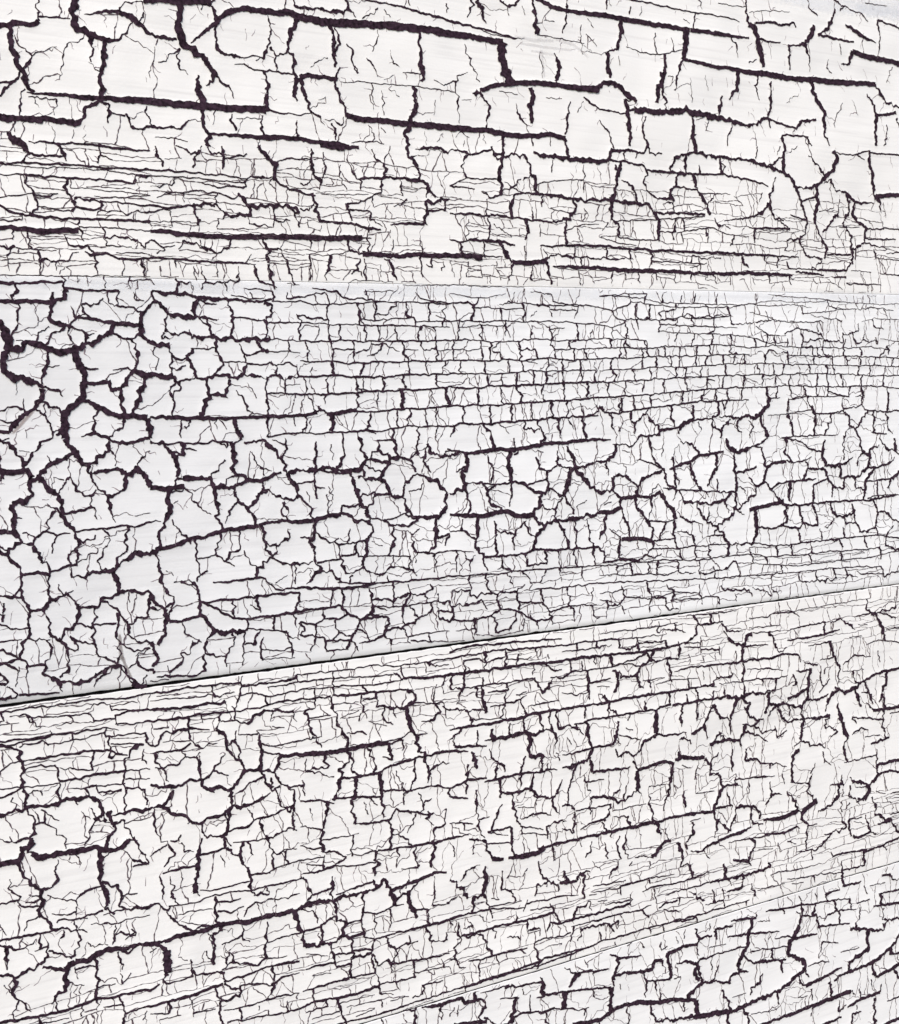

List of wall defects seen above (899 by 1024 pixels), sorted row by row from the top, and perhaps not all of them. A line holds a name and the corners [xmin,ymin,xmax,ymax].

crack [346,44,359,74]
crack [464,44,480,82]
crack [467,0,525,23]
crack [736,0,815,70]
crack [818,0,868,55]
crack [837,16,899,83]
crack [884,990,899,1024]